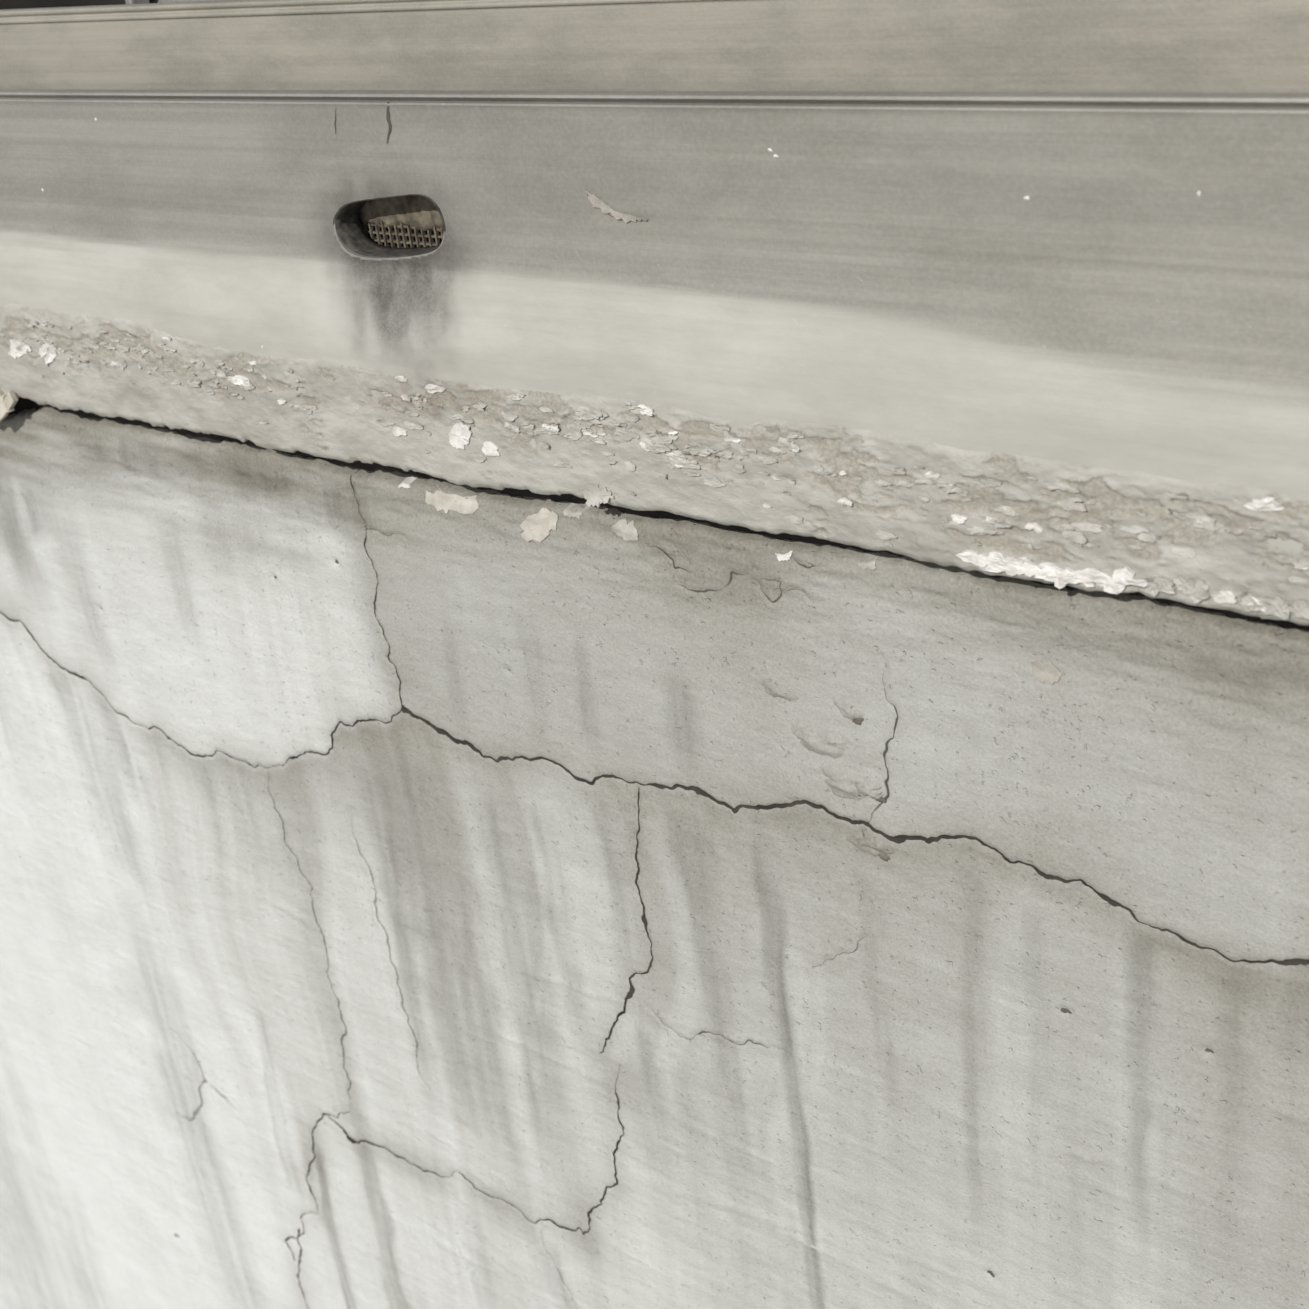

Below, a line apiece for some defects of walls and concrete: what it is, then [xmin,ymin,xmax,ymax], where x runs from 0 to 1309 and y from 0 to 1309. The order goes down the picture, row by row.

peeling [585,190,650,223]
spalling [0,388,18,422]
peeling [8,321,317,414]
peeling [375,375,804,495]
peeling [583,484,636,508]
peeling [775,550,794,562]
peeling [811,465,1309,620]
crack [0,397,1309,1303]